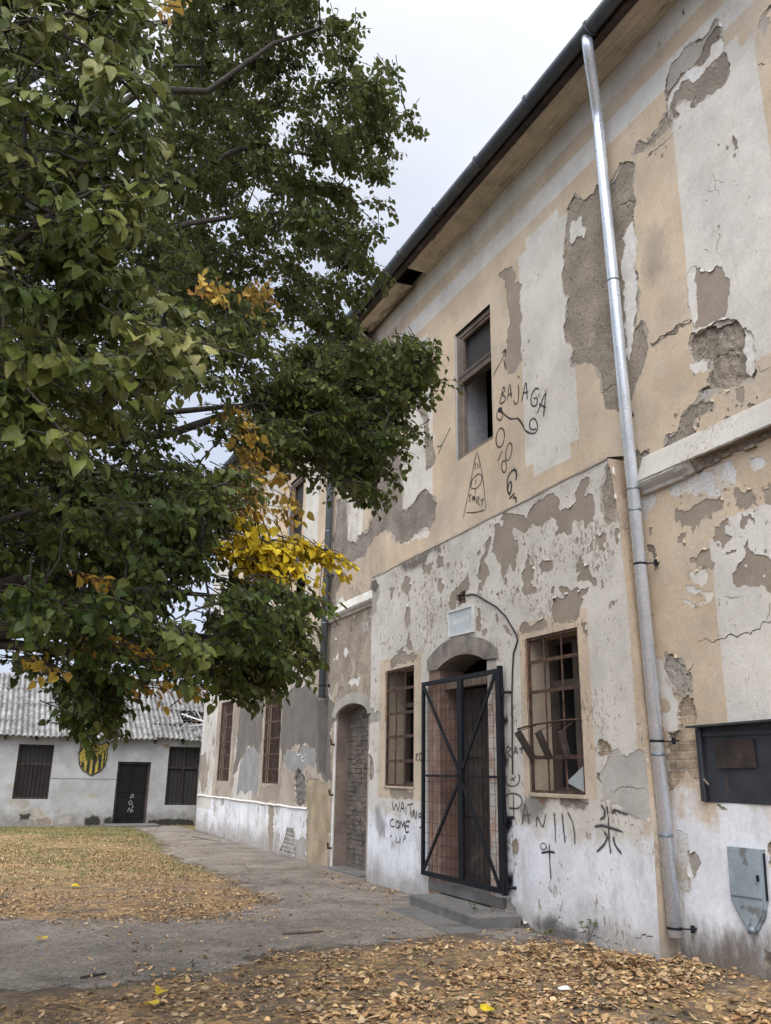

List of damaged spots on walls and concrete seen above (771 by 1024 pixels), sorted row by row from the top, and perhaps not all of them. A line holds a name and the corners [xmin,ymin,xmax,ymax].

spalling [561,18,758,448]
peeling [498,266,530,375]
peeling [640,493,659,570]
peeling [669,433,771,608]
peeling [221,448,621,866]
crack [688,604,771,671]
peeling [596,723,651,823]
flaking render [656,651,699,792]
peeling [675,830,702,914]